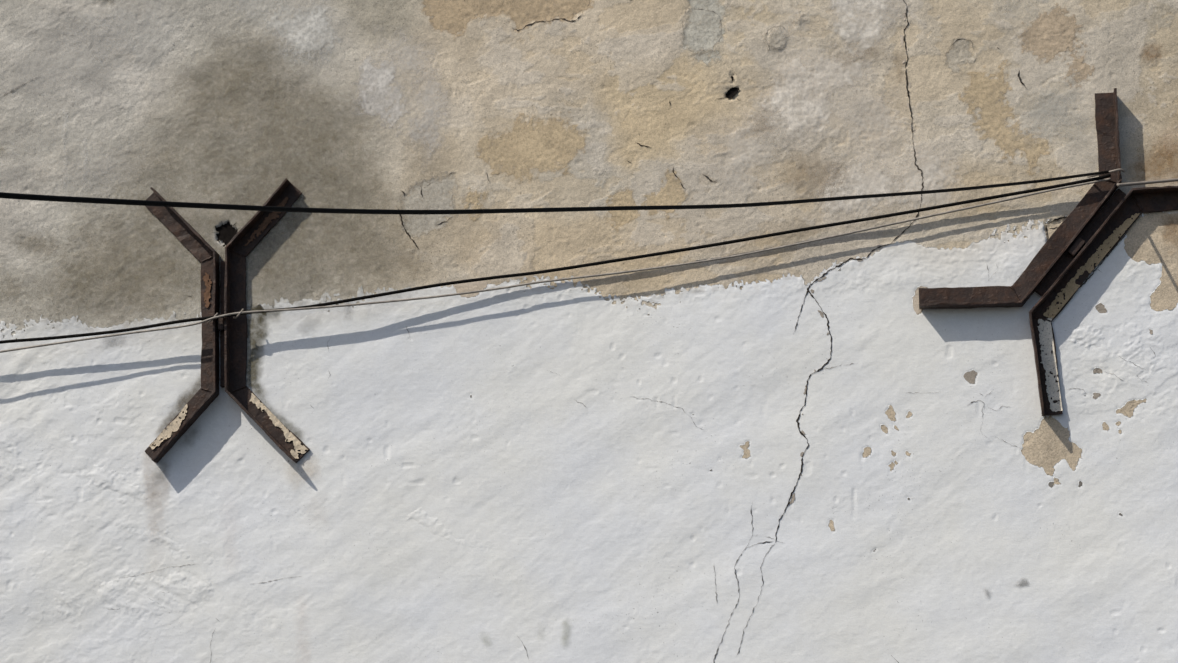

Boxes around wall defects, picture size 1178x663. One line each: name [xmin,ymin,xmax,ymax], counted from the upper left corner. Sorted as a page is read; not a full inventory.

flaking render [423,0,593,36]
flaking render [682,0,726,65]
flaking render [1021,6,1094,86]
damp [359,48,446,143]
flaking render [720,74,741,101]
flaking render [213,197,288,247]
flaking render [400,172,486,237]
flaking render [606,171,686,231]
crack [713,0,924,661]
peeling [912,286,927,314]
peeling [1021,213,1178,487]
peeling [881,405,912,433]